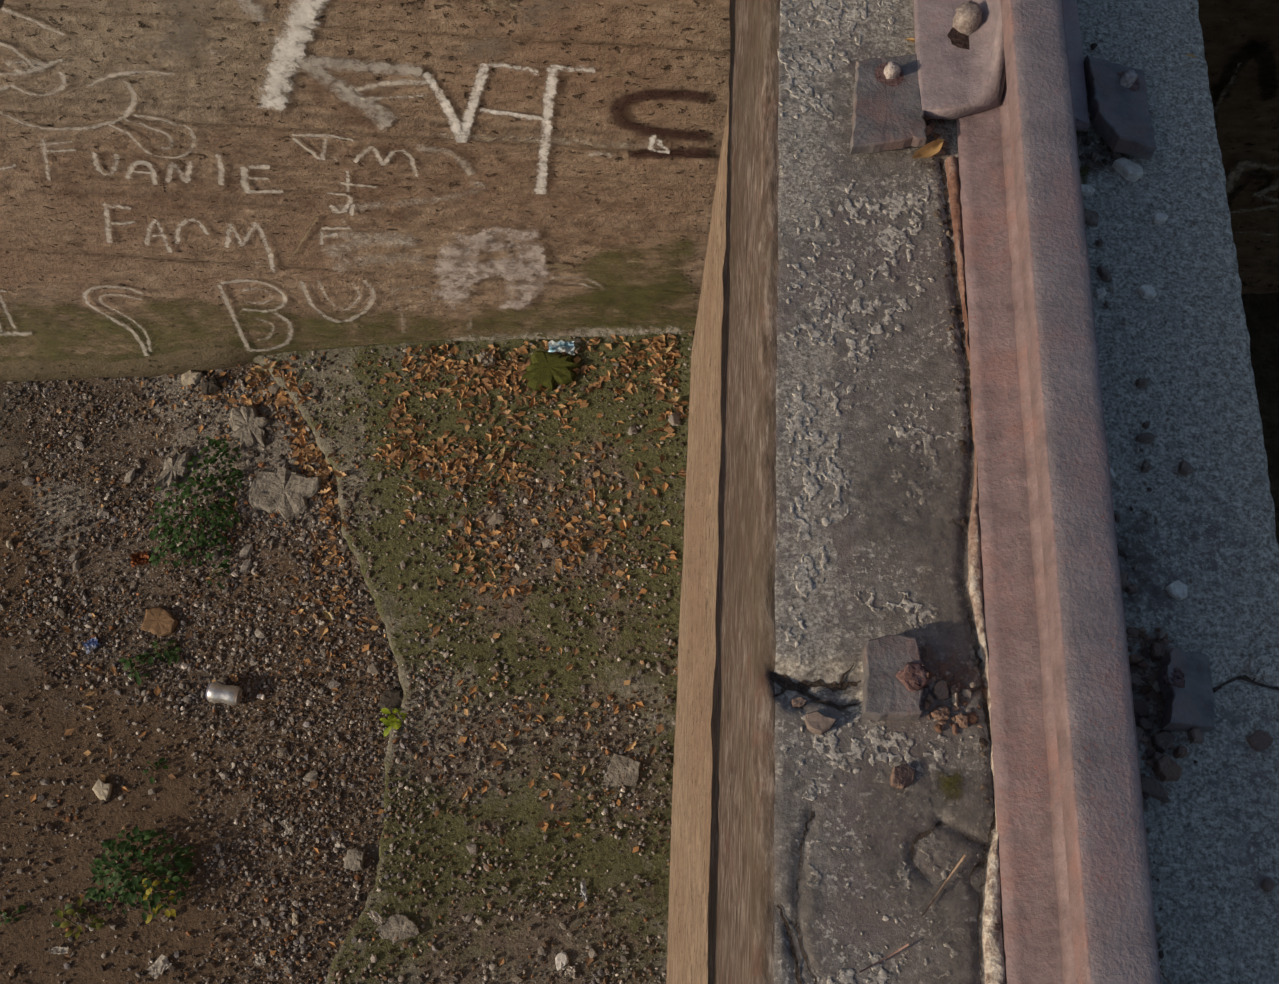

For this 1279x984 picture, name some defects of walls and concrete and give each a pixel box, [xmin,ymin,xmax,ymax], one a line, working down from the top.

rust [875,63,904,87]
crack [771,659,863,710]
crack [1212,668,1279,692]
crack [776,811,817,984]